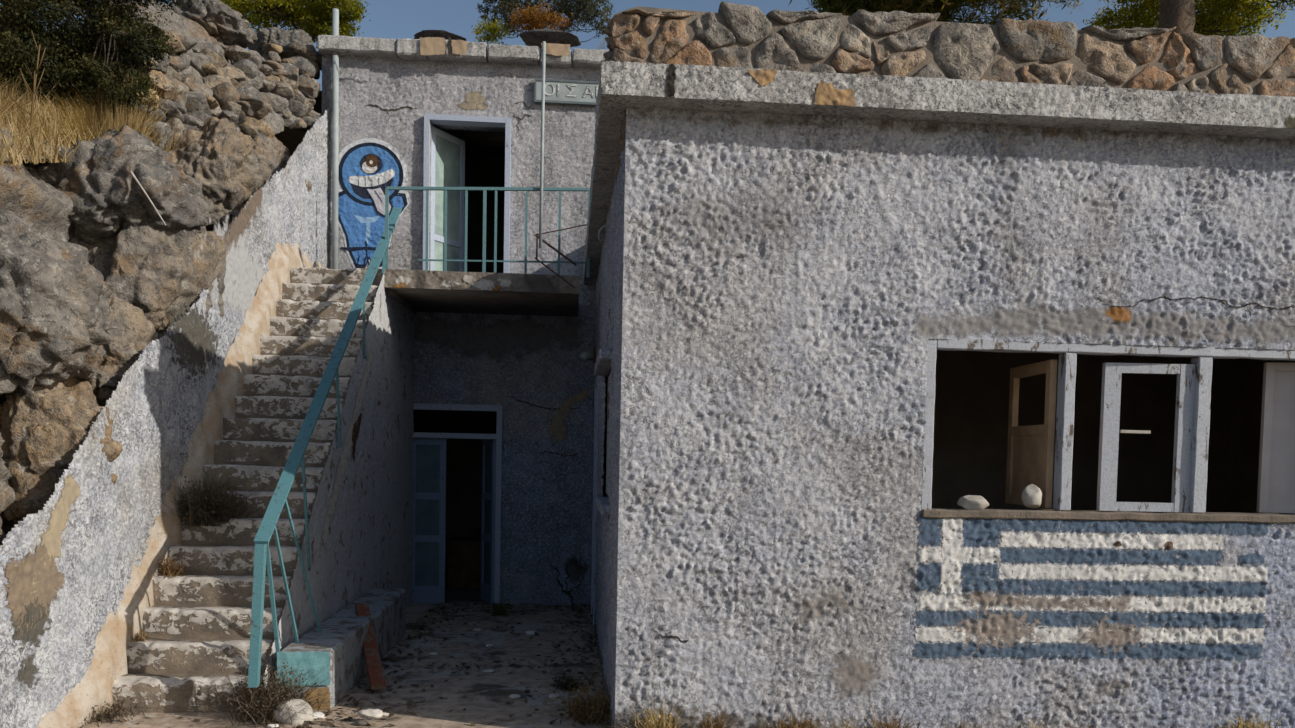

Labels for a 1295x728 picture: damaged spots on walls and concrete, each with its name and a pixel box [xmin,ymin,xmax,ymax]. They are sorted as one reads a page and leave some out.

crack [1098,296,1295,327]
peeling [112,267,382,710]
peeling [946,590,1156,653]